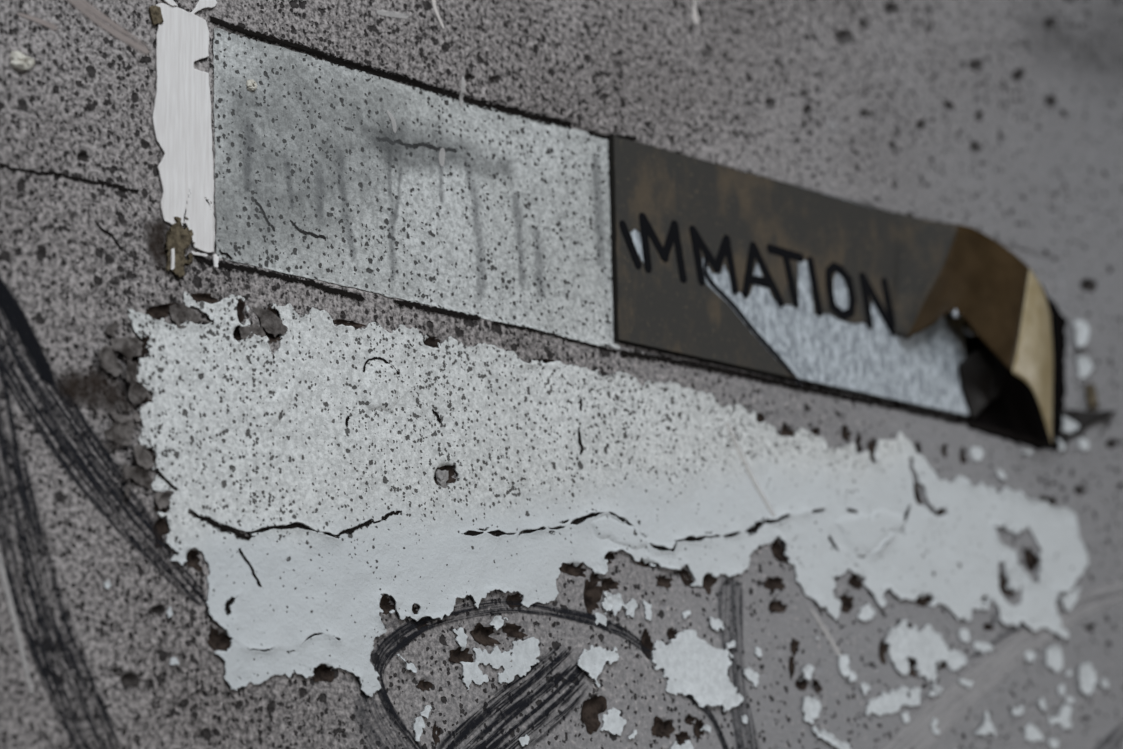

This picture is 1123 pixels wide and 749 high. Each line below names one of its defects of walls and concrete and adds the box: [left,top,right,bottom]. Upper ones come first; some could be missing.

crack [0,162,139,193]
crack [155,466,400,587]
peeling [98,291,1108,749]
crack [466,505,911,557]